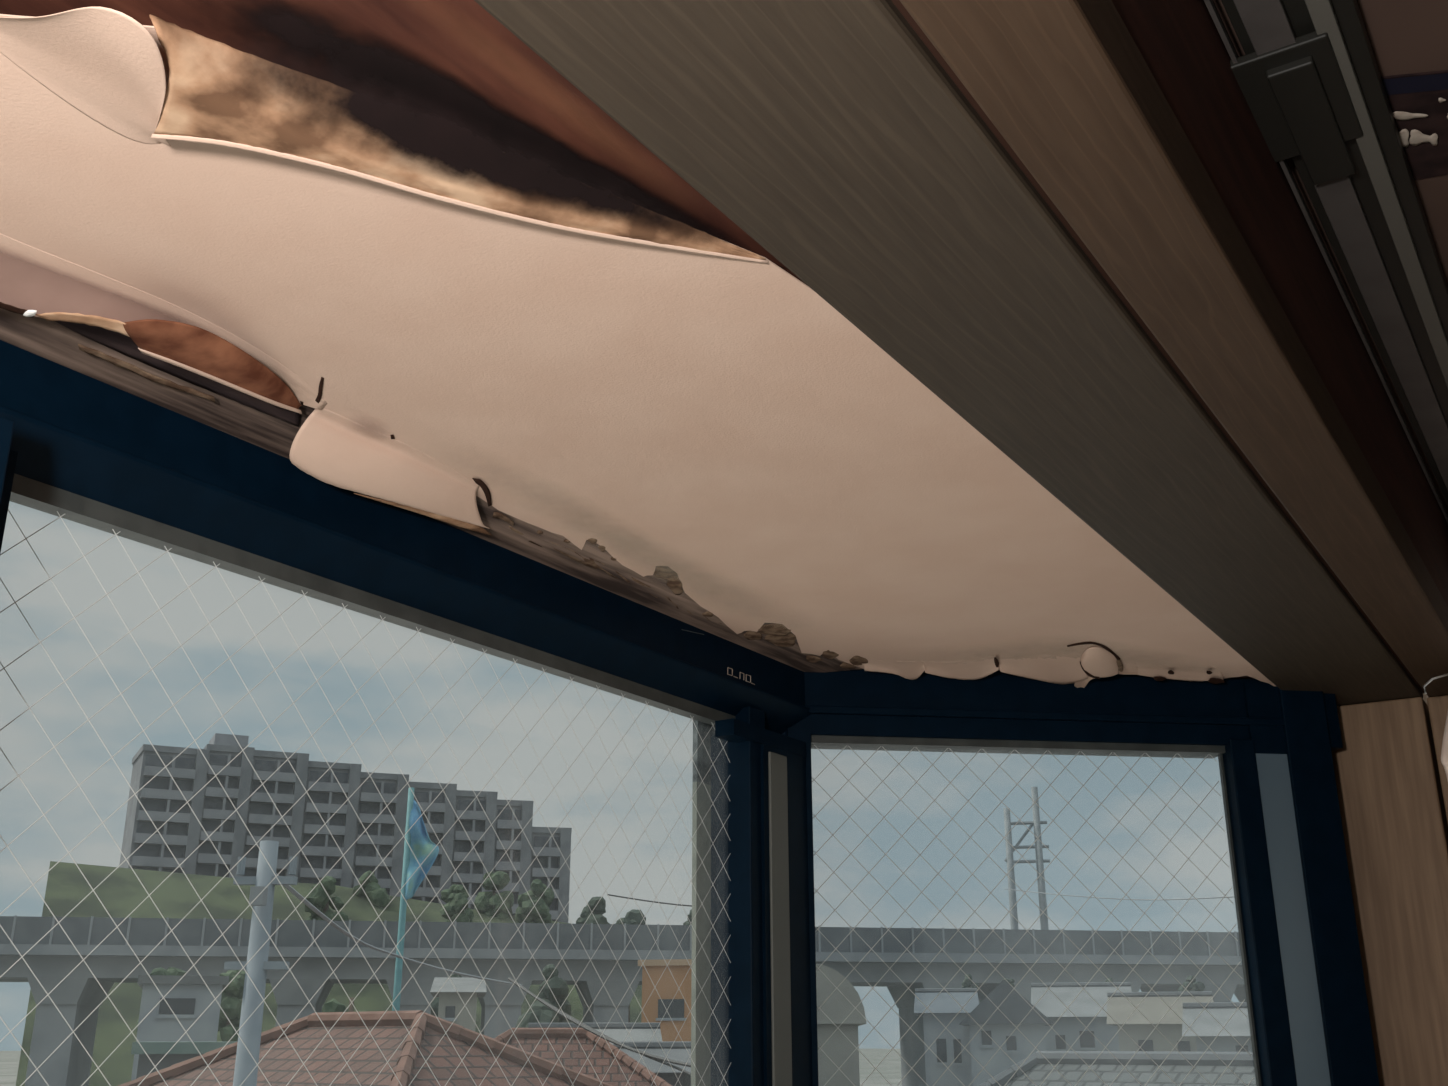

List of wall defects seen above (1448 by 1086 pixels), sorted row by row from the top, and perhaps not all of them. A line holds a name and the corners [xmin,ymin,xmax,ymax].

damp [237,4,719,236]
peeling [1392,111,1438,147]
spalling [55,321,300,427]
spalling [508,525,868,669]